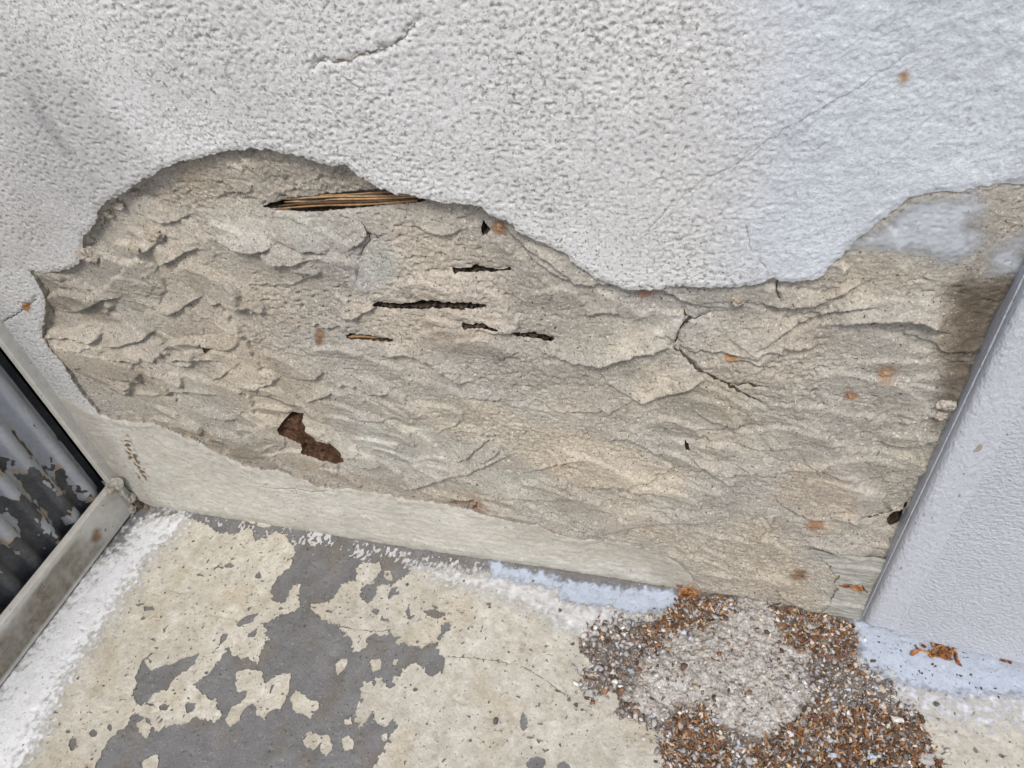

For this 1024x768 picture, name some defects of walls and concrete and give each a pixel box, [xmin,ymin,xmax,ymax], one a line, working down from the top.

crack [673,309,761,402]
spalling [32,148,1024,768]
damp [0,554,87,678]